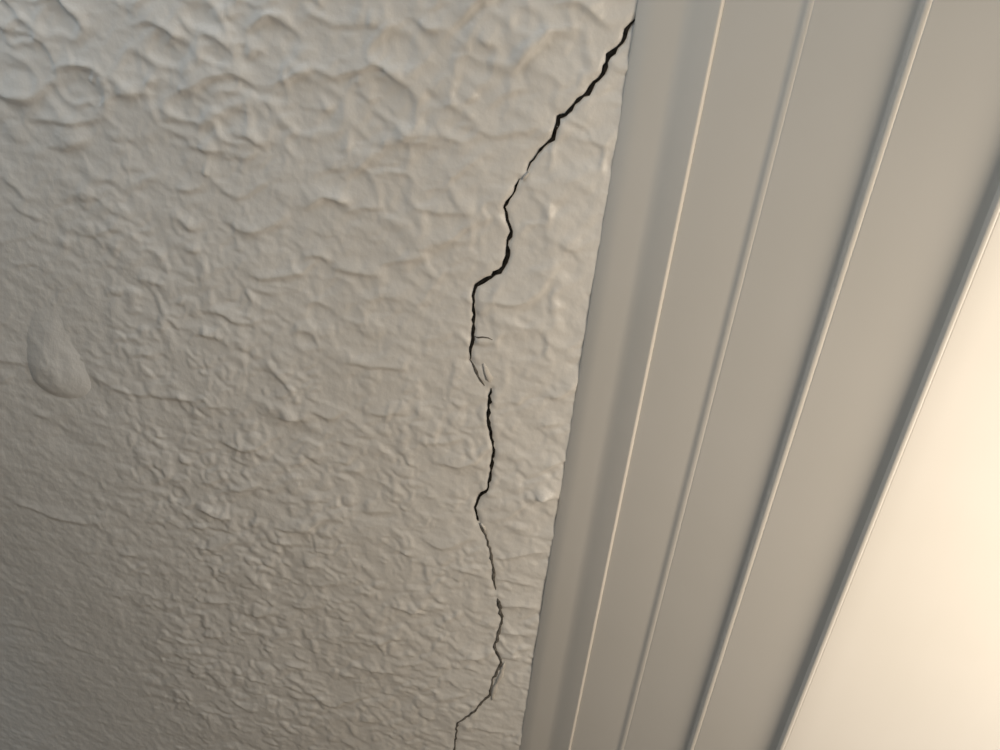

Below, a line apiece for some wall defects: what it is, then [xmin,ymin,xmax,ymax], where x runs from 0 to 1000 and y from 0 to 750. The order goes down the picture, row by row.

crack [453,19,635,750]